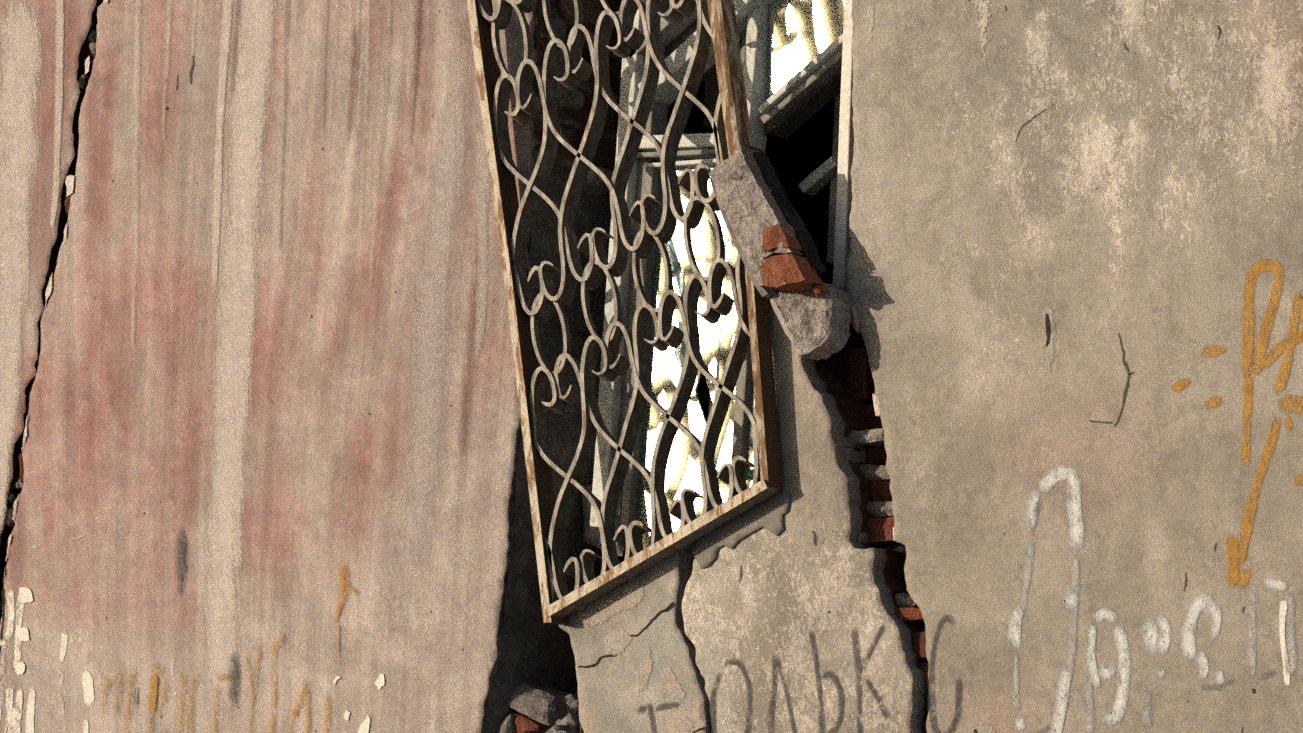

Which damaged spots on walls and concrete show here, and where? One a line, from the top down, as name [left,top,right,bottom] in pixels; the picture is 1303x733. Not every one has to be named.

crack [78,0,108,89]
crack [44,157,78,310]
crack [1088,333,1134,427]
crack [0,385,33,648]
crack [578,602,674,668]